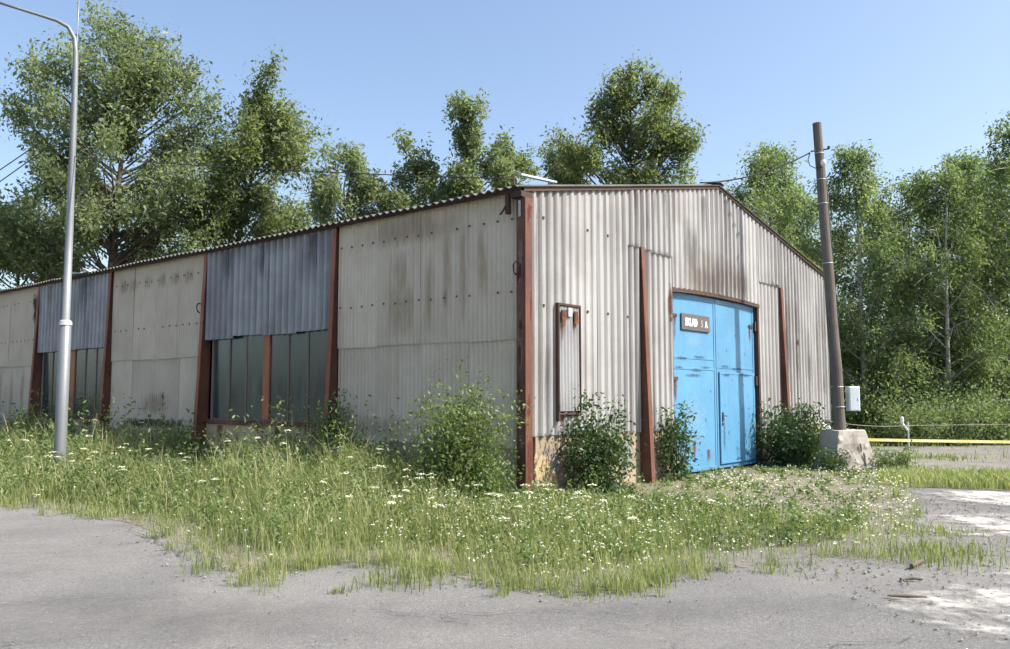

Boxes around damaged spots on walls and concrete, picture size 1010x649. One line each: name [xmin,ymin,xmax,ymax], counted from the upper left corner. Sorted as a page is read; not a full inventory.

corrosion [560,312,579,338]